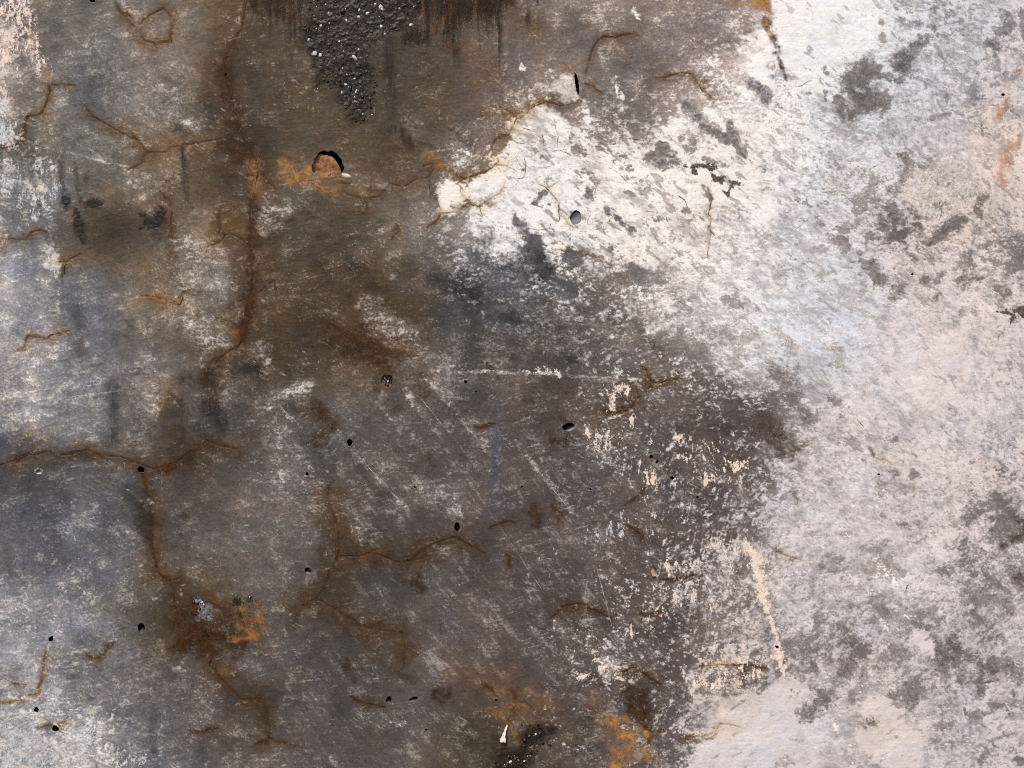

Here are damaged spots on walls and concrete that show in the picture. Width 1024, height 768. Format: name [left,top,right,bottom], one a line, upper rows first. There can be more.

crack [209,4,276,358]
crack [424,162,491,222]
crack [471,101,573,251]
crack [0,441,235,485]
crack [297,509,377,630]
crack [151,533,286,746]
corrosion [607,694,650,768]